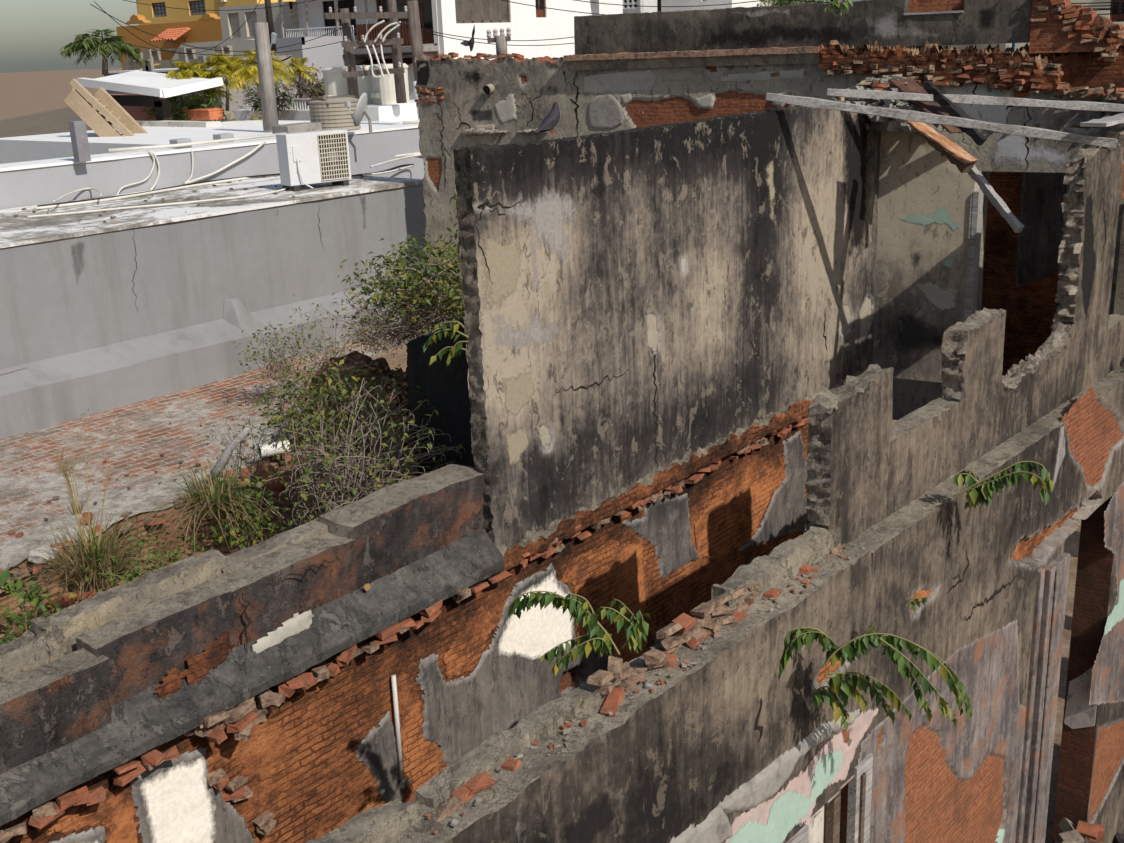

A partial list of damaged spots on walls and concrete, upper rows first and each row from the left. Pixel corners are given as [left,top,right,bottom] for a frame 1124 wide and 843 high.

crack [554,65,579,135]
spalling [625,91,792,128]
spalling [424,158,442,191]
water stain [595,167,605,198]
water stain [843,116,870,255]
water stain [507,192,576,289]
spalling [154,630,235,699]
peeling [252,609,314,654]
spalling [184,689,285,745]
spalling [206,768,253,802]
peeling [725,708,883,843]
spalling [904,726,1005,843]